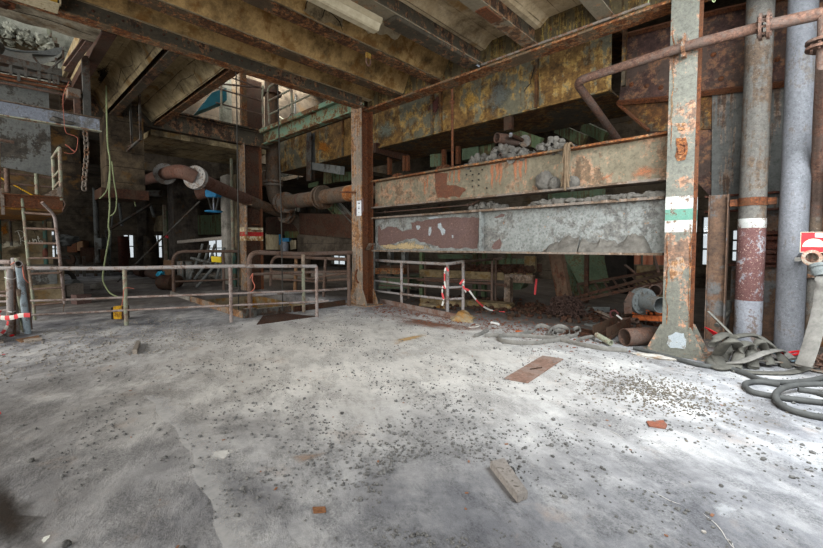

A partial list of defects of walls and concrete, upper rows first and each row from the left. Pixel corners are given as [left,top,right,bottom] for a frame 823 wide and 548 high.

rust [670,55,688,161]
peeling [378,216,479,249]